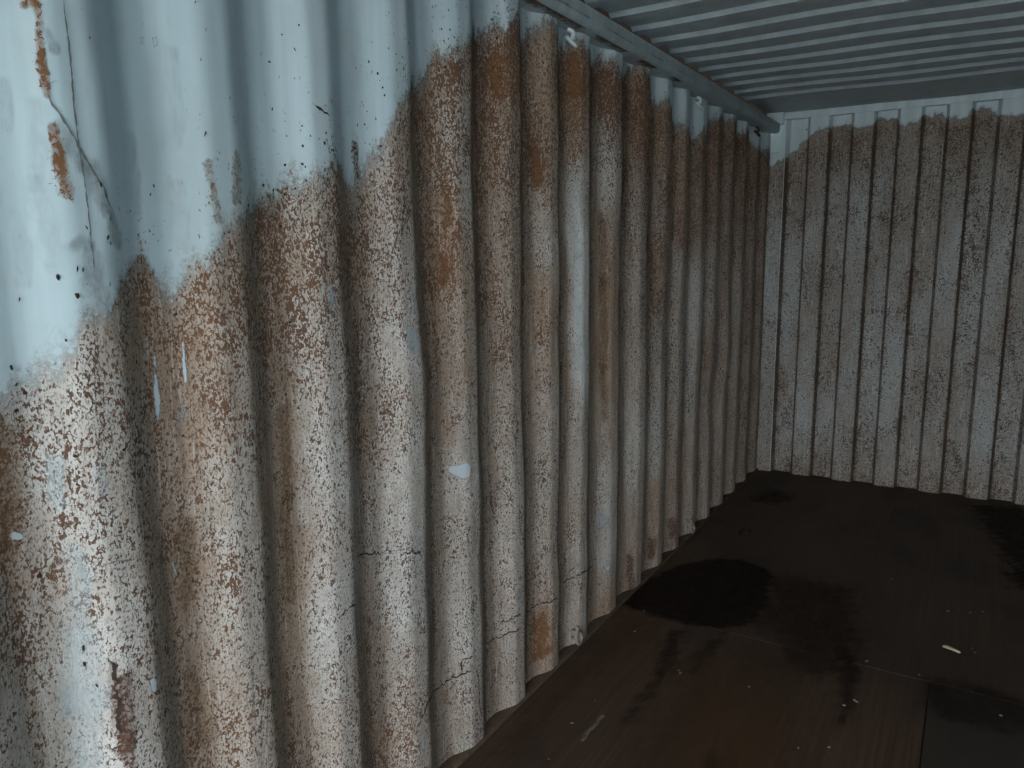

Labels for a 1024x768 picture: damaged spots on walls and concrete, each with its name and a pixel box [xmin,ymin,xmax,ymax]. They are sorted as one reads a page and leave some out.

rust [595,35,628,52]
rust [0,0,623,768]
rust [616,64,1024,597]
crack [358,549,422,558]
crack [422,566,593,722]
damp [623,559,773,657]